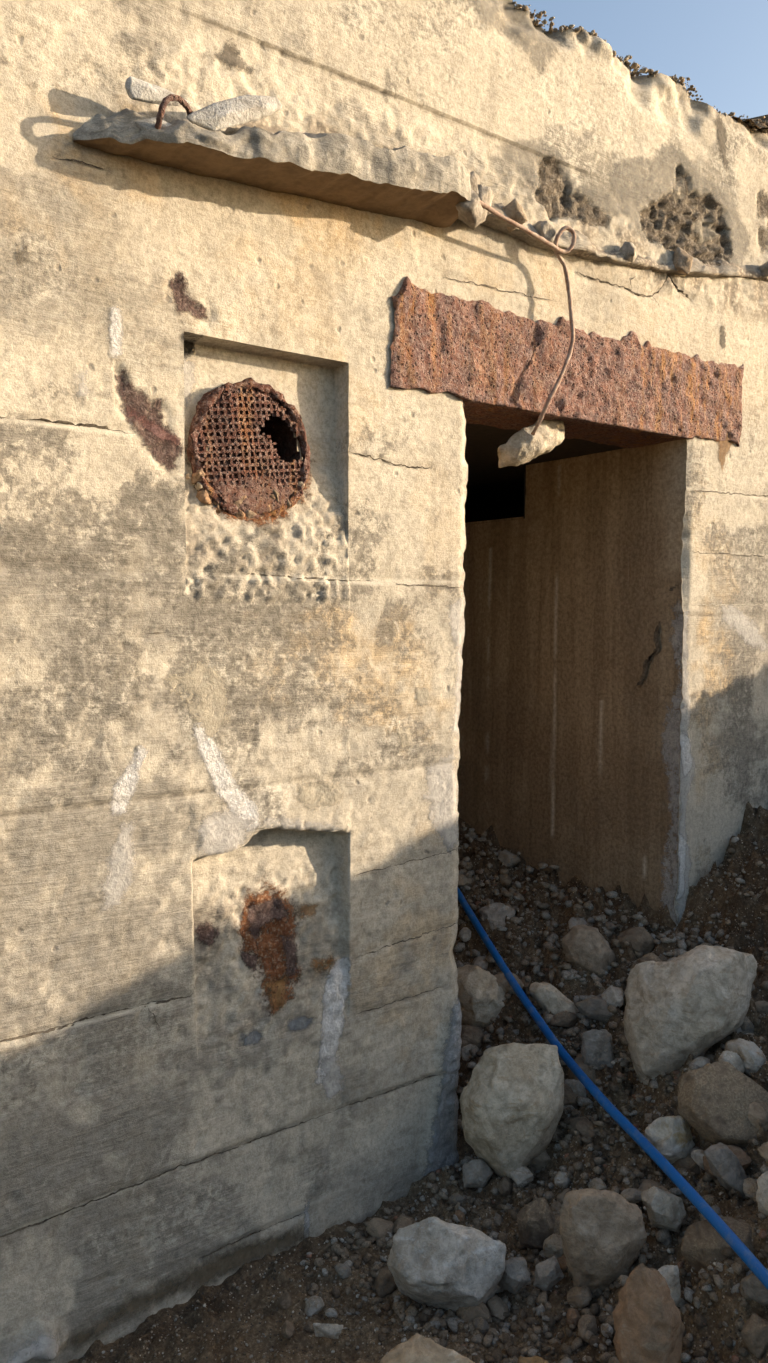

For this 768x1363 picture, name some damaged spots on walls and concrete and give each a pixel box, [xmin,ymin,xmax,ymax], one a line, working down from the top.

spalling [535,154,612,228]
spalling [640,171,734,266]
rust [170,272,208,320]
rust [116,369,315,527]
rust [195,882,335,1016]